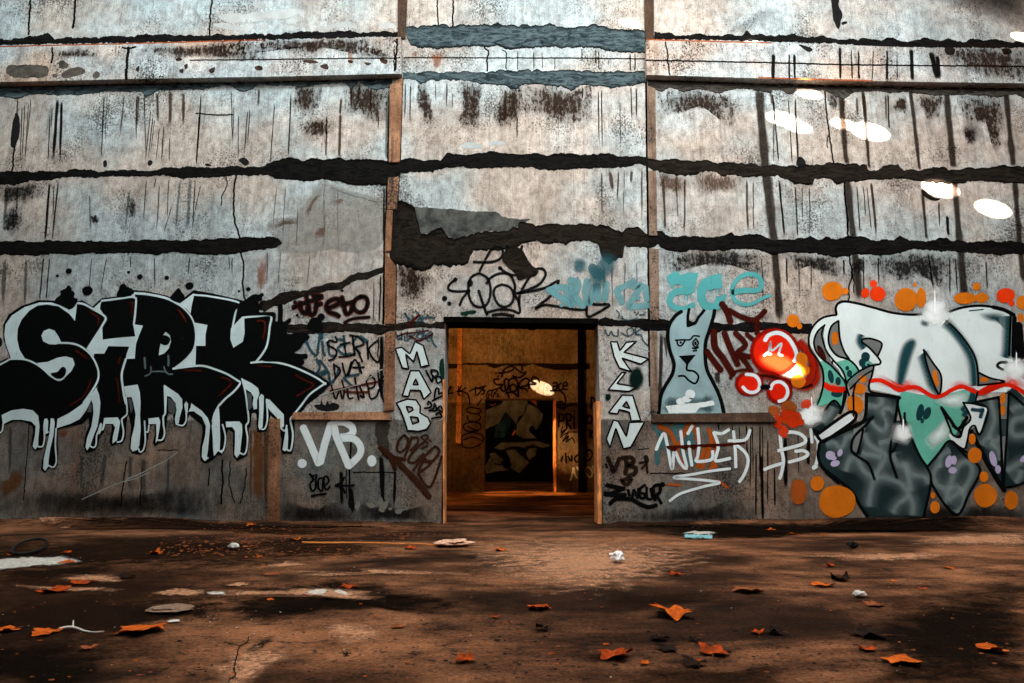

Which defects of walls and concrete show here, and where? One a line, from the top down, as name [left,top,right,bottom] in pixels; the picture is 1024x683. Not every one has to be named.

leakage [404,81,483,129]
leakage [494,84,603,142]
leakage [788,55,796,79]
leakage [827,92,871,168]
leakage [839,47,1015,169]
crack [189,0,1024,387]
leakage [1012,183,1024,280]